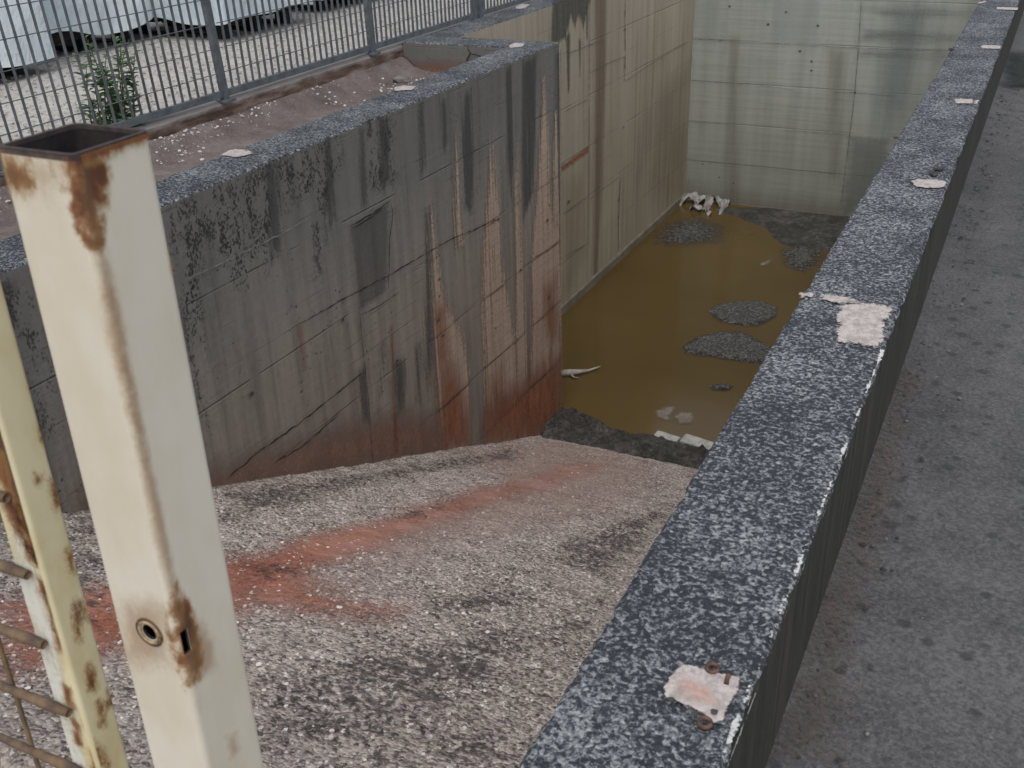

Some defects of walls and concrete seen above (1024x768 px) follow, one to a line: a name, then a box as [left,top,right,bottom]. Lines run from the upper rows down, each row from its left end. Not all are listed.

corrosion [65,133,150,251]
damp [395,0,590,451]
spalling [912,179,946,188]
mould [2,284,49,373]
damp [170,136,344,428]
crack [228,200,497,478]
spalling [799,292,893,393]
corrosion [0,435,37,565]
corrosion [166,583,203,686]
spalling [778,544,808,622]
corrosion [62,683,110,768]
spalling [663,662,758,767]